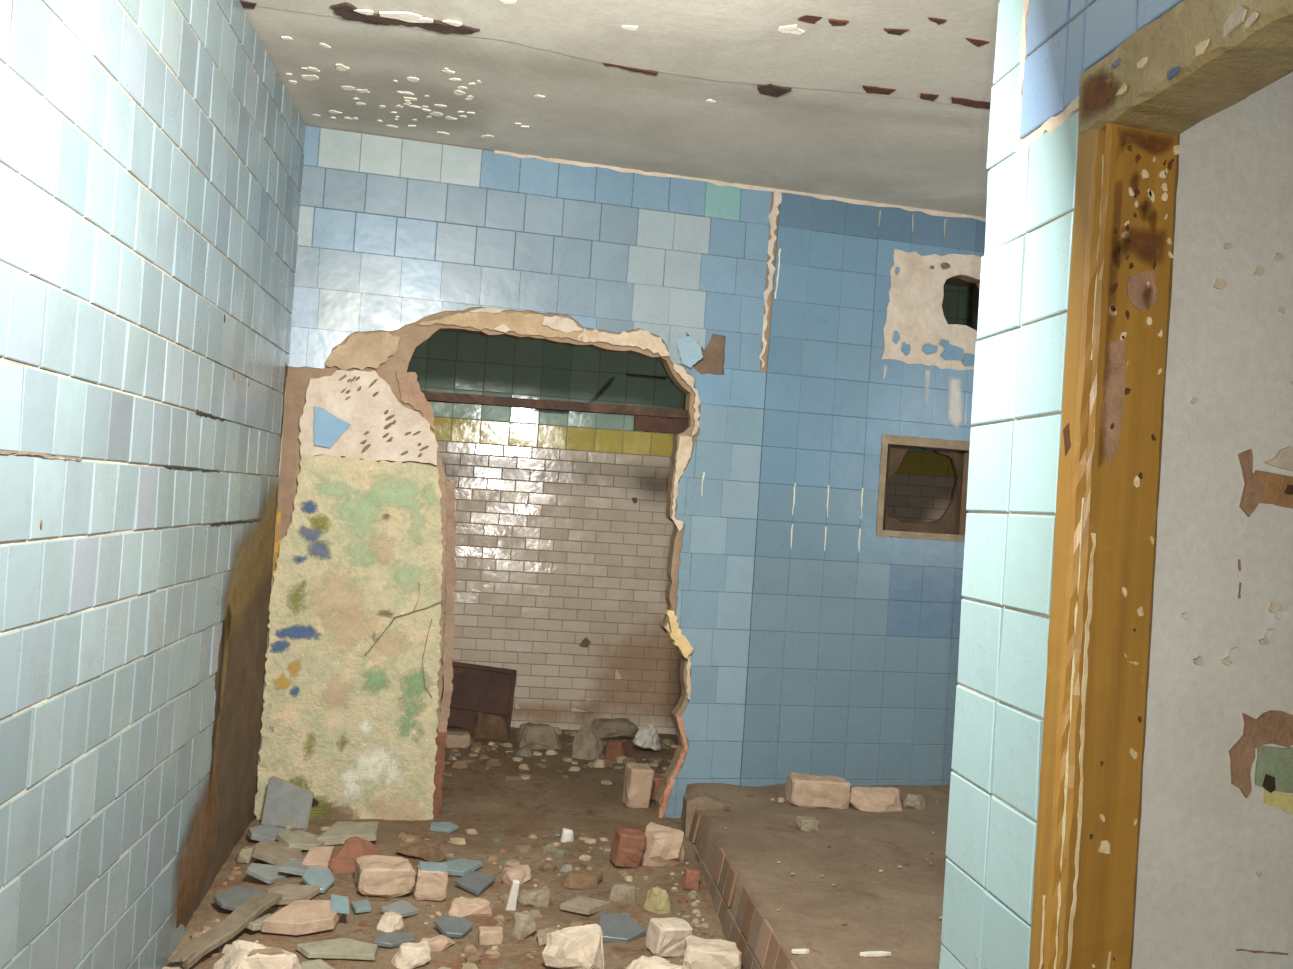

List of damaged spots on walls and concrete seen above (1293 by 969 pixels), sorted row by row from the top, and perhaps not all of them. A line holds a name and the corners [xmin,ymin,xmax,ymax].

spalling [330,2,480,35]
peeling [778,15,849,35]
peeling [312,64,482,135]
spalling [603,62,658,76]
spalling [757,84,791,97]
spalling [863,85,896,95]
spalling [920,93,991,109]
spalling [881,249,982,370]
spalling [417,308,725,532]
flaking render [1238,447,1293,517]
spalling [664,610,693,700]
flaking render [1229,710,1293,814]